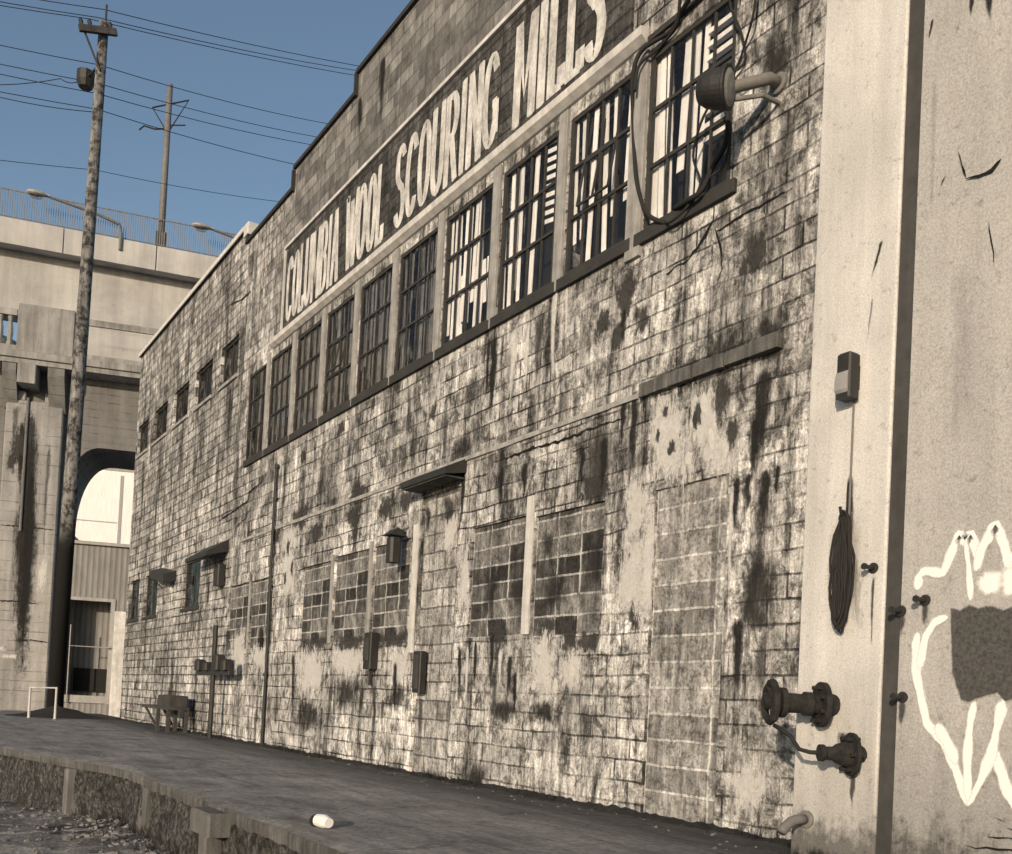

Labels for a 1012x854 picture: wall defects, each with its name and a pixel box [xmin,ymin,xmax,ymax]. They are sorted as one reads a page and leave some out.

leakage [620,392,645,465]
leakage [442,473,465,525]
leakage [577,438,611,504]
leakage [0,409,50,671]
leakage [292,654,323,731]
leakage [336,680,363,708]
leakage [382,663,408,715]
leakage [458,636,516,723]
leakage [528,701,558,721]
leakage [581,712,591,734]